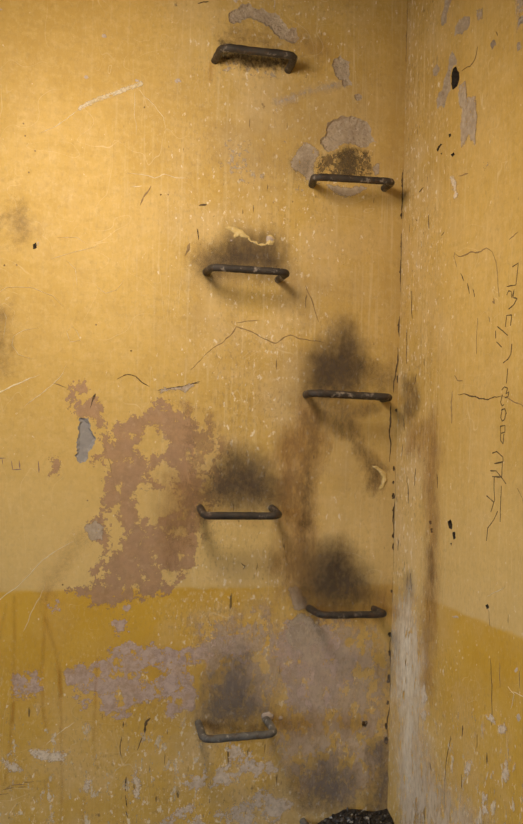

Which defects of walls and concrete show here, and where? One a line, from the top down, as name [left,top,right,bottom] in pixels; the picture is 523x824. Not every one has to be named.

flaking render [228,0,299,44]
peeling [432,47,478,157]
flaking render [290,115,377,191]
peeling [225,226,275,246]
crack [118,287,321,393]
peeling [62,380,251,720]
peeling [10,670,44,700]
peeling [28,729,73,770]
peeling [160,742,278,824]
peeling [209,788,294,824]
peeling [261,584,358,720]
peeling [397,602,515,824]